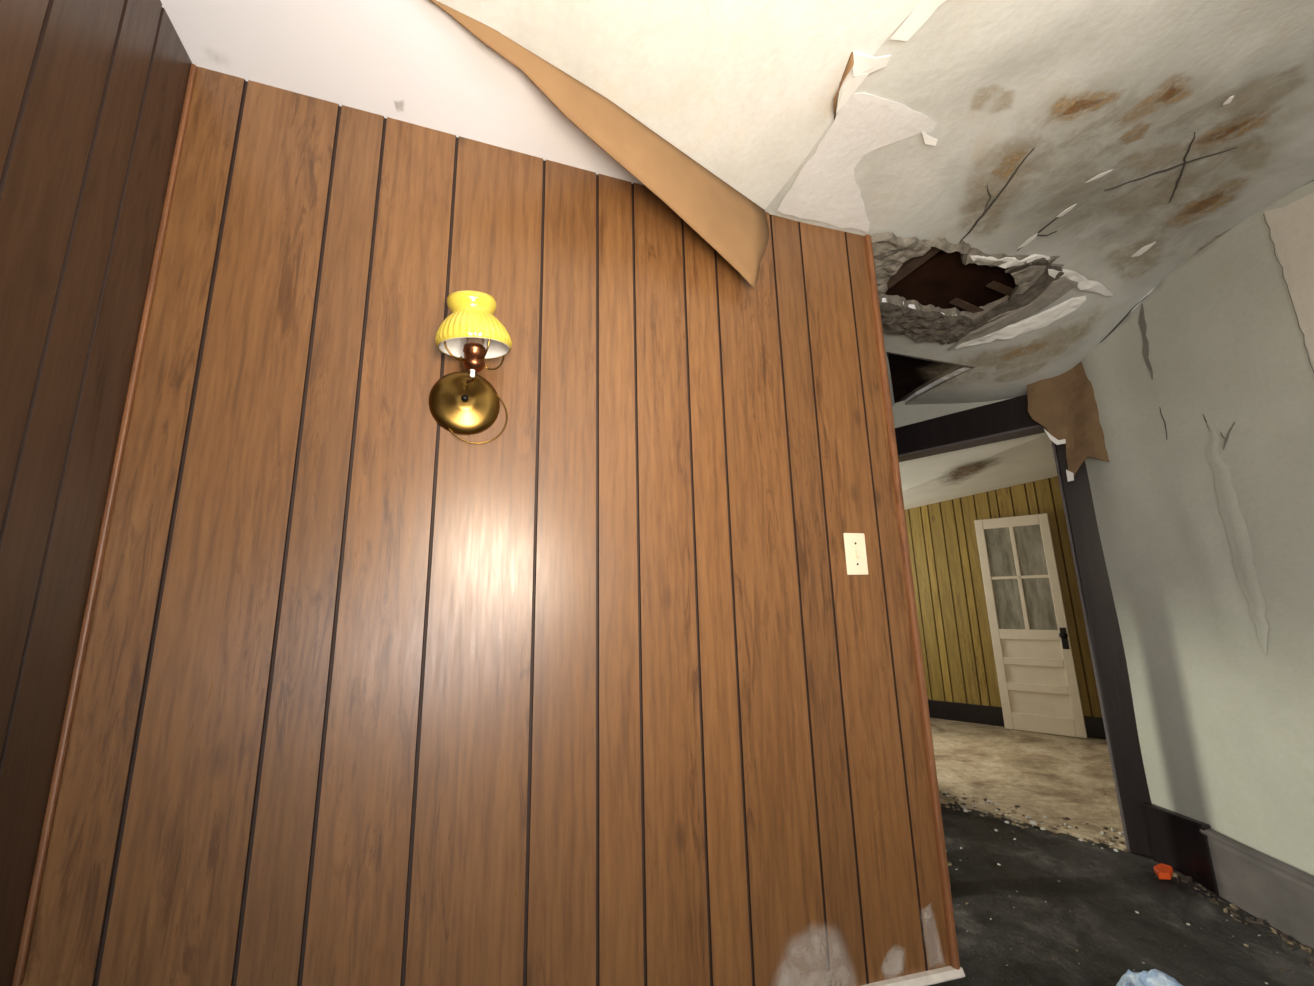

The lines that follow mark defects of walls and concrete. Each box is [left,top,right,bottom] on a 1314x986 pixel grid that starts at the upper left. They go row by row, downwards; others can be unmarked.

water stain [1053,93,1116,126]
water stain [1122,80,1188,142]
water stain [1158,112,1267,232]
peeling [1131,242,1156,257]
crack [1263,214,1314,372]
water stain [884,951,902,974]